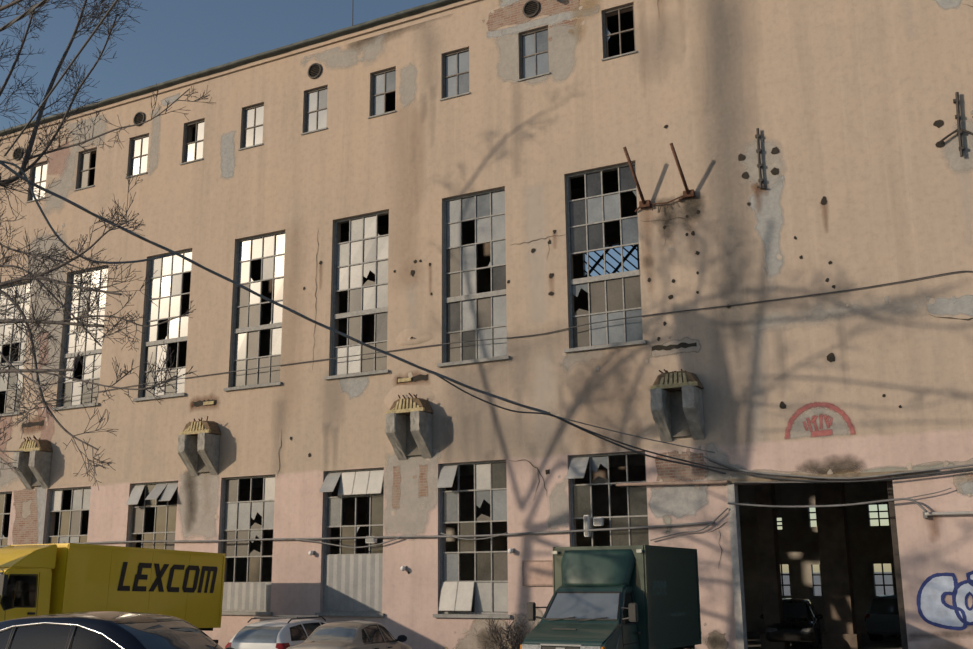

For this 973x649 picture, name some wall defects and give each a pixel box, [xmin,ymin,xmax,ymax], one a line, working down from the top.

spalling [482,0,585,41]
spalling [391,466,401,516]
spalling [413,448,441,498]
crack [509,459,547,498]
damp [804,459,954,480]
spalling [12,488,41,545]